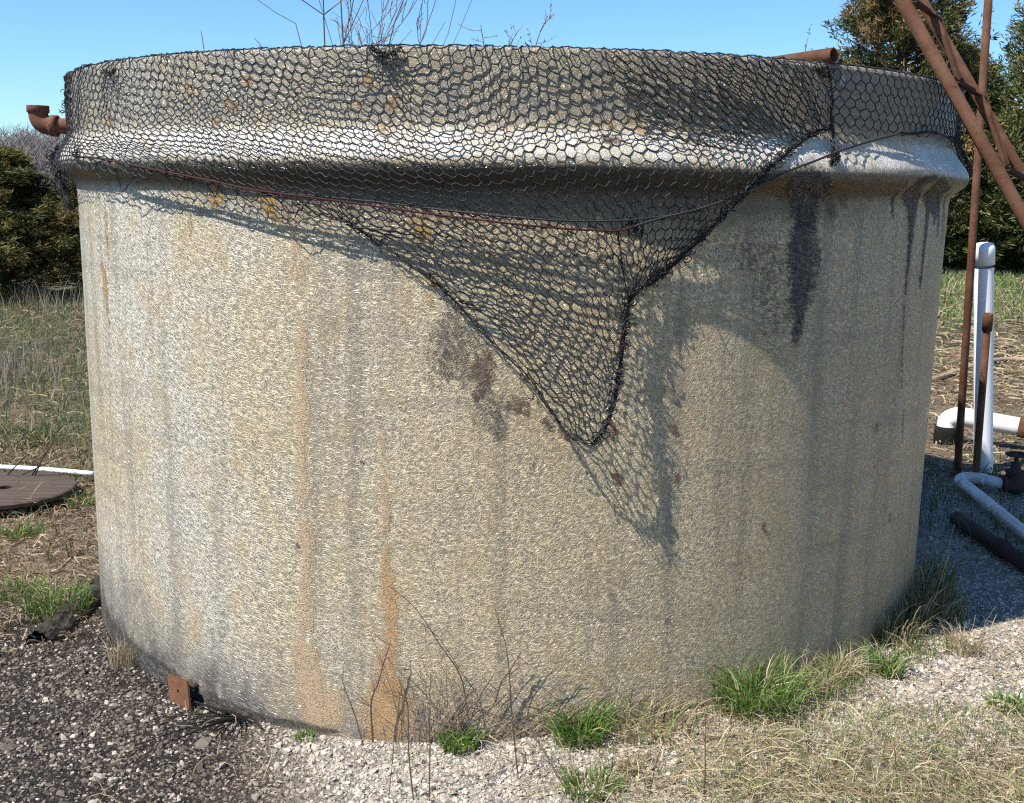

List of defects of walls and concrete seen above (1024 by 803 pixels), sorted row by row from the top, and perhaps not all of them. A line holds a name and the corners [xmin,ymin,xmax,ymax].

leakage [733,157,953,383]
leakage [469,345,580,445]
rust [292,319,419,742]